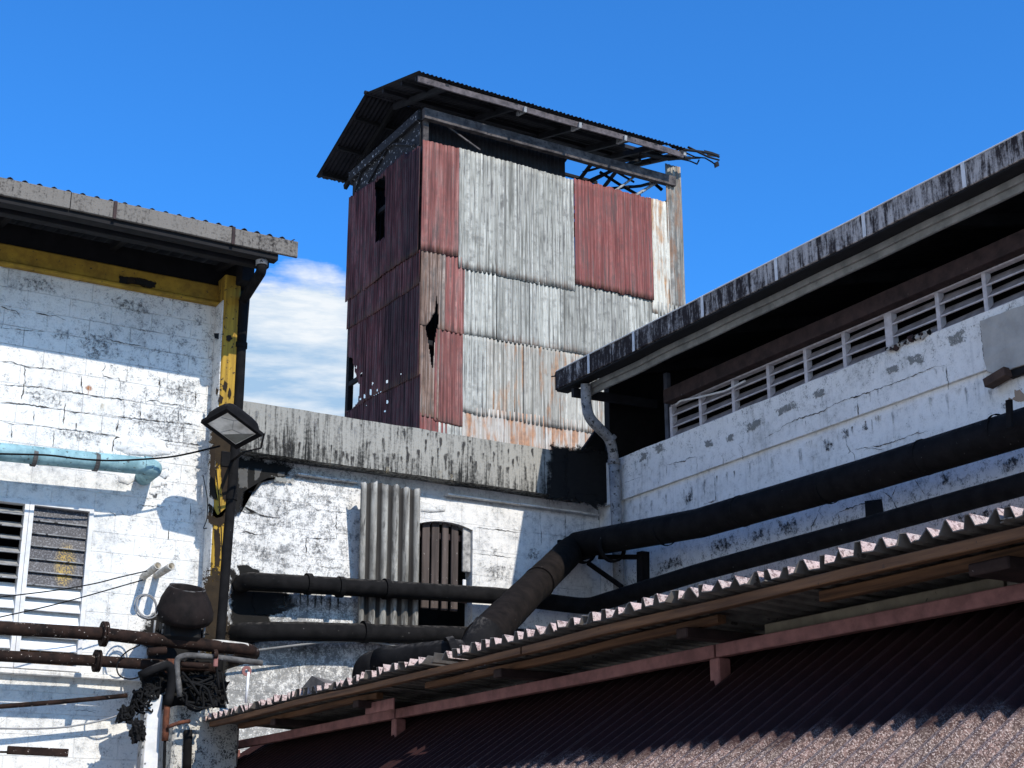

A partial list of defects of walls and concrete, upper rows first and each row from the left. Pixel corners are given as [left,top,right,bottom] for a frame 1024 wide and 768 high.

leakage [129,380,192,444]
leakage [366,428,621,510]
crack [770,366,949,435]
crack [845,431,928,461]